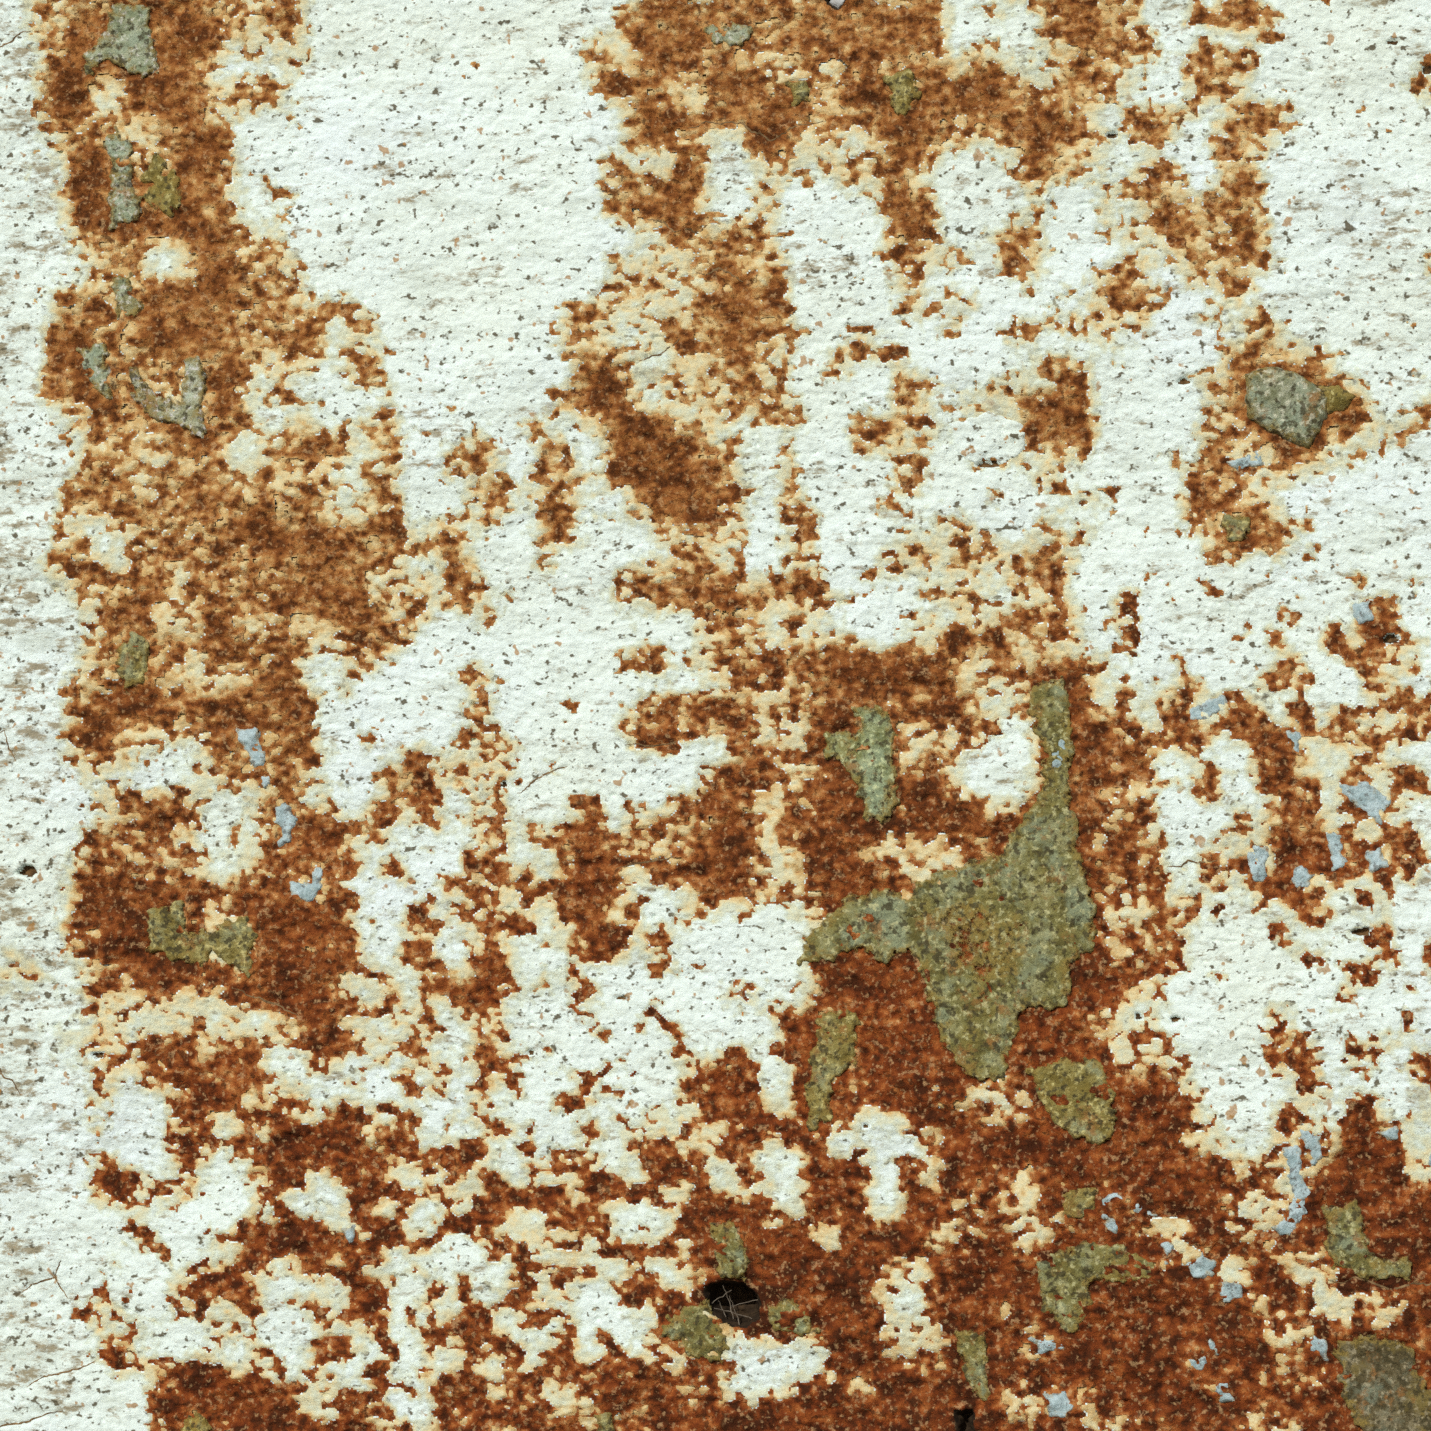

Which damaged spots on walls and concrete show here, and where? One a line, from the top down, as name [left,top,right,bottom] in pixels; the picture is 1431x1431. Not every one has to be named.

peeling [1188,0,1285,44]
peeling [993,200,1058,297]
peeling [995,244,1172,345]
peeling [822,325,940,534]
spalling [941,353,1121,517]
spalling [1172,298,1379,568]
peeling [517,421,597,571]
peeling [1103,589,1141,657]
peeling [1300,923,1402,1003]
peeling [549,1062,625,1115]
peeling [1258,1004,1333,1105]
peeling [121,1218,172,1262]